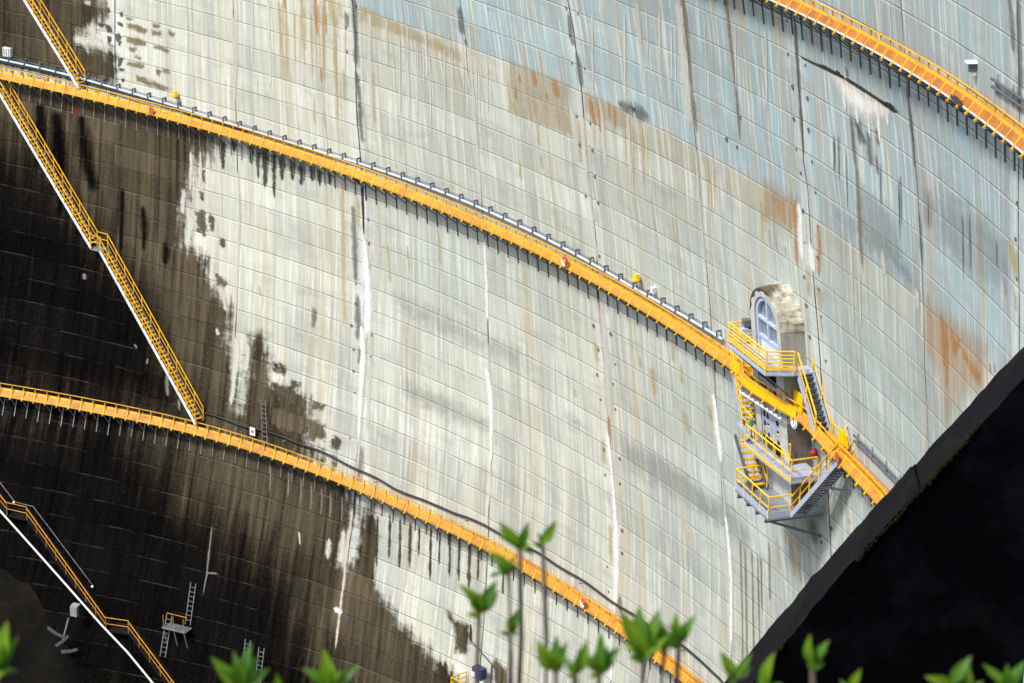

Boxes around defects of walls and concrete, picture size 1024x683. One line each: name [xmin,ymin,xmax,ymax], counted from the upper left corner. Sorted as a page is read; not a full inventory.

damp [444,10,492,198]
crack [800,56,898,112]
damp [0,0,480,683]
damp [485,345,493,528]
damp [607,432,619,615]
corrosion [941,319,995,386]